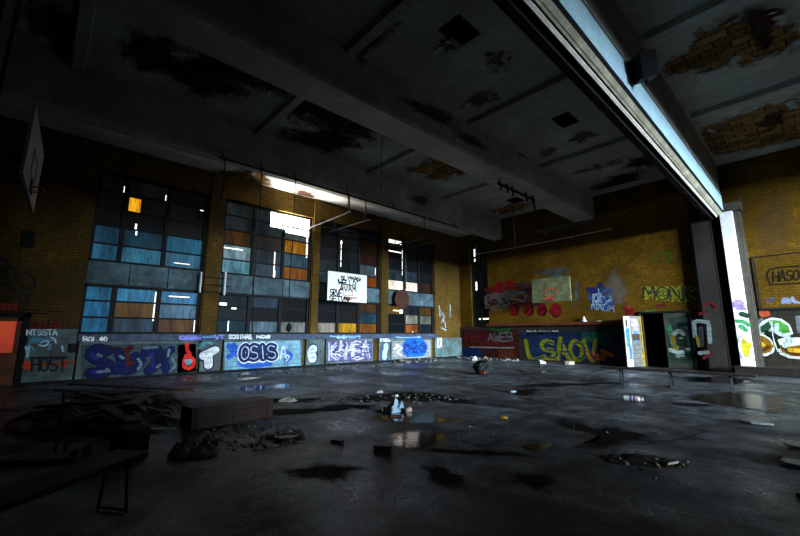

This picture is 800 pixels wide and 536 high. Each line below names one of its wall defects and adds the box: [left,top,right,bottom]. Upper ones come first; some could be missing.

peeling [662,4,800,75]
peeling [699,94,800,156]
peeling [405,159,468,183]